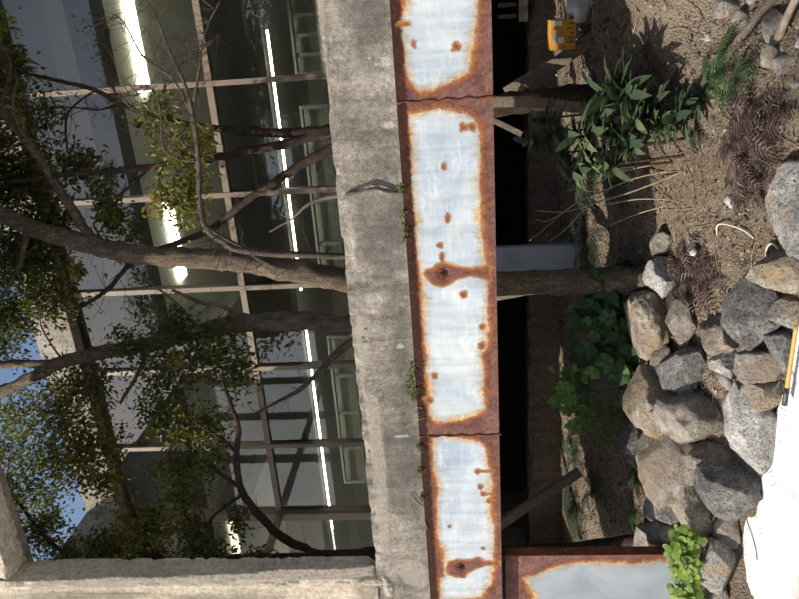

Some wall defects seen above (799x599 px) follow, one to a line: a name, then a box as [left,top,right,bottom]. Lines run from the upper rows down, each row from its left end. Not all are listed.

rust [390,0,667,599]